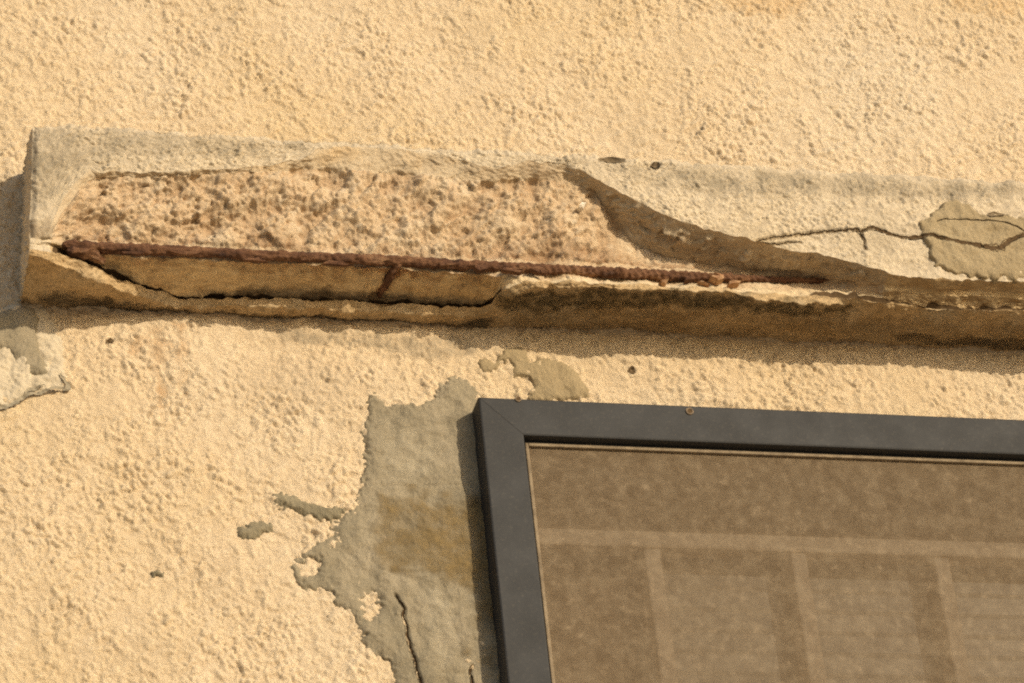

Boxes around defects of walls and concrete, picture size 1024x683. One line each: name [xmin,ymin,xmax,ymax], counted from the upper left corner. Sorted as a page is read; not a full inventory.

spalling [51,146,1024,310]
crack [759,218,1024,252]
crack [52,246,502,308]